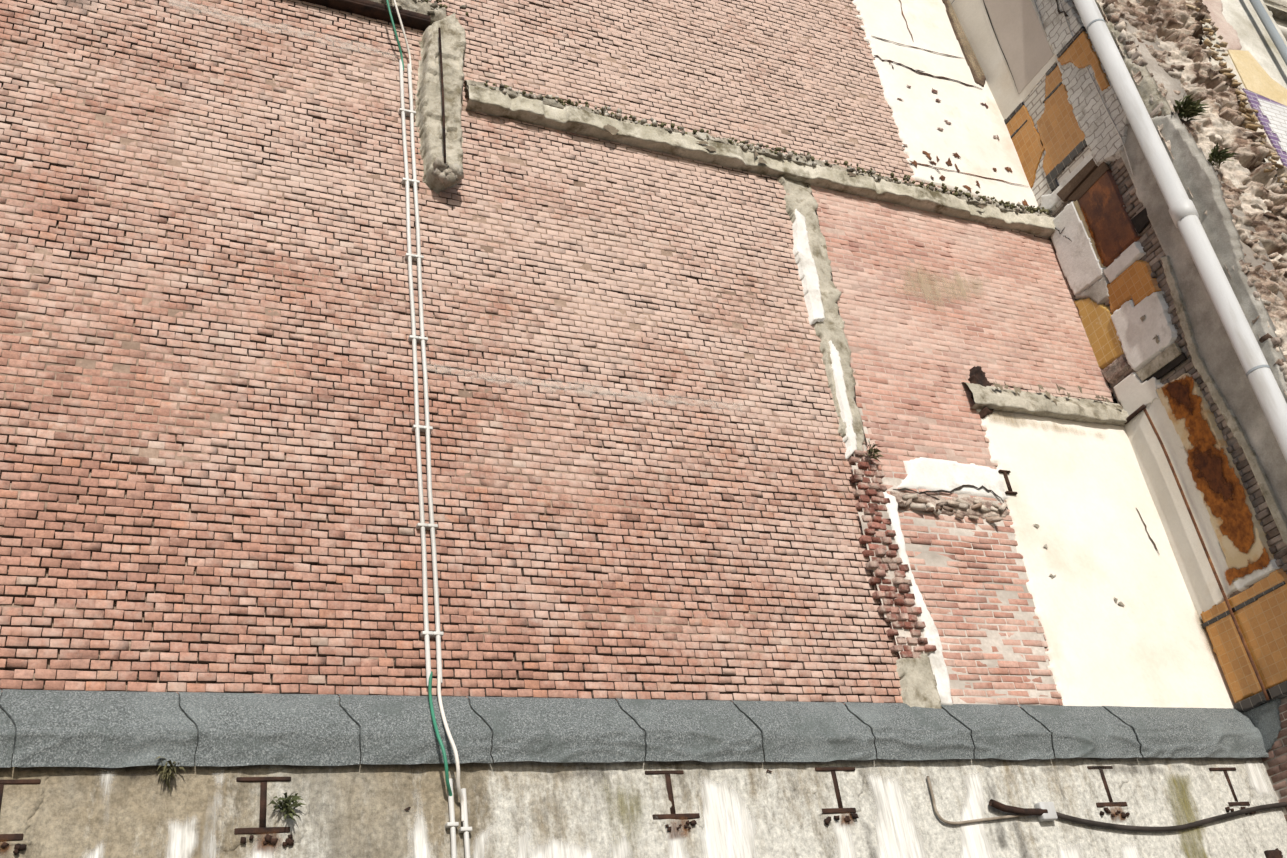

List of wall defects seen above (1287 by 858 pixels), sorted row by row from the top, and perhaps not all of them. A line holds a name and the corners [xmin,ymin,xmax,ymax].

rust [1081,207,1104,264]
rust [1161,375,1270,585]
spalling [890,491,1010,523]
water stain [167,820,215,858]
water stain [252,843,274,858]
water stain [413,816,430,858]
water stain [474,833,488,858]
water stain [518,834,596,858]
water stain [612,837,628,858]
water stain [668,779,756,858]
water stain [835,822,856,858]
water stain [869,775,926,858]